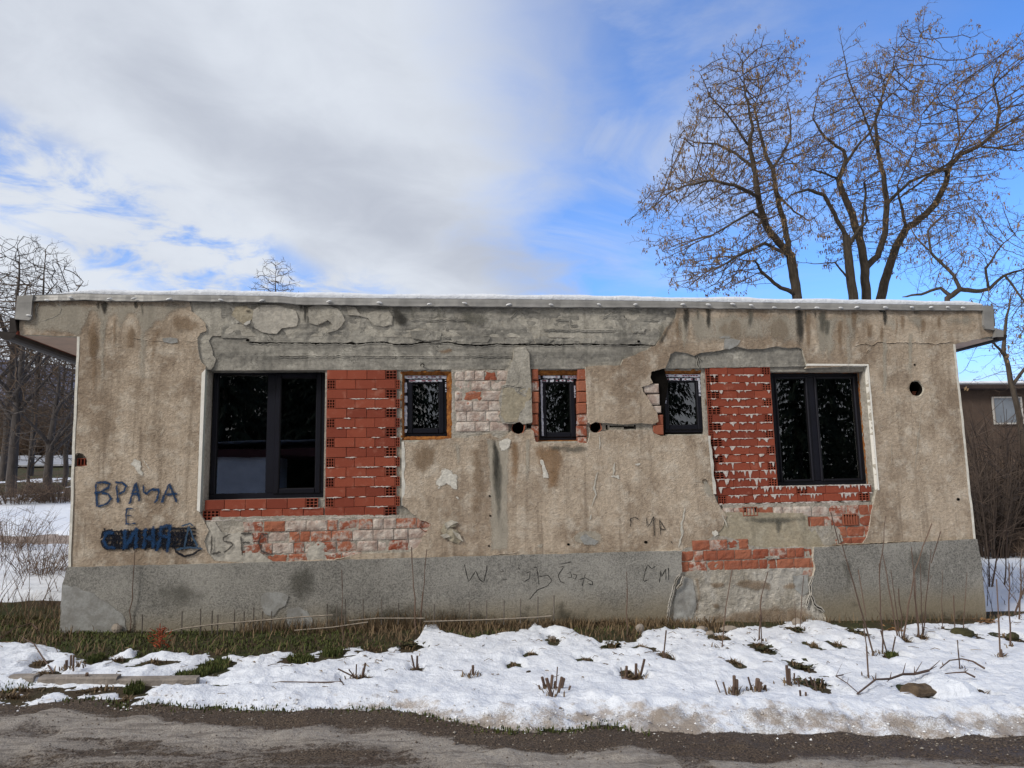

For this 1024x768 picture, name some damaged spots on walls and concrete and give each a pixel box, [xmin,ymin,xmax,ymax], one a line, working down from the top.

crack [247,308,659,358]
damp [660,309,860,358]
spalling [221,303,676,439]
damp [487,438,511,549]
spalling [204,514,431,563]
spalling [669,501,873,623]
crack [805,576,825,613]